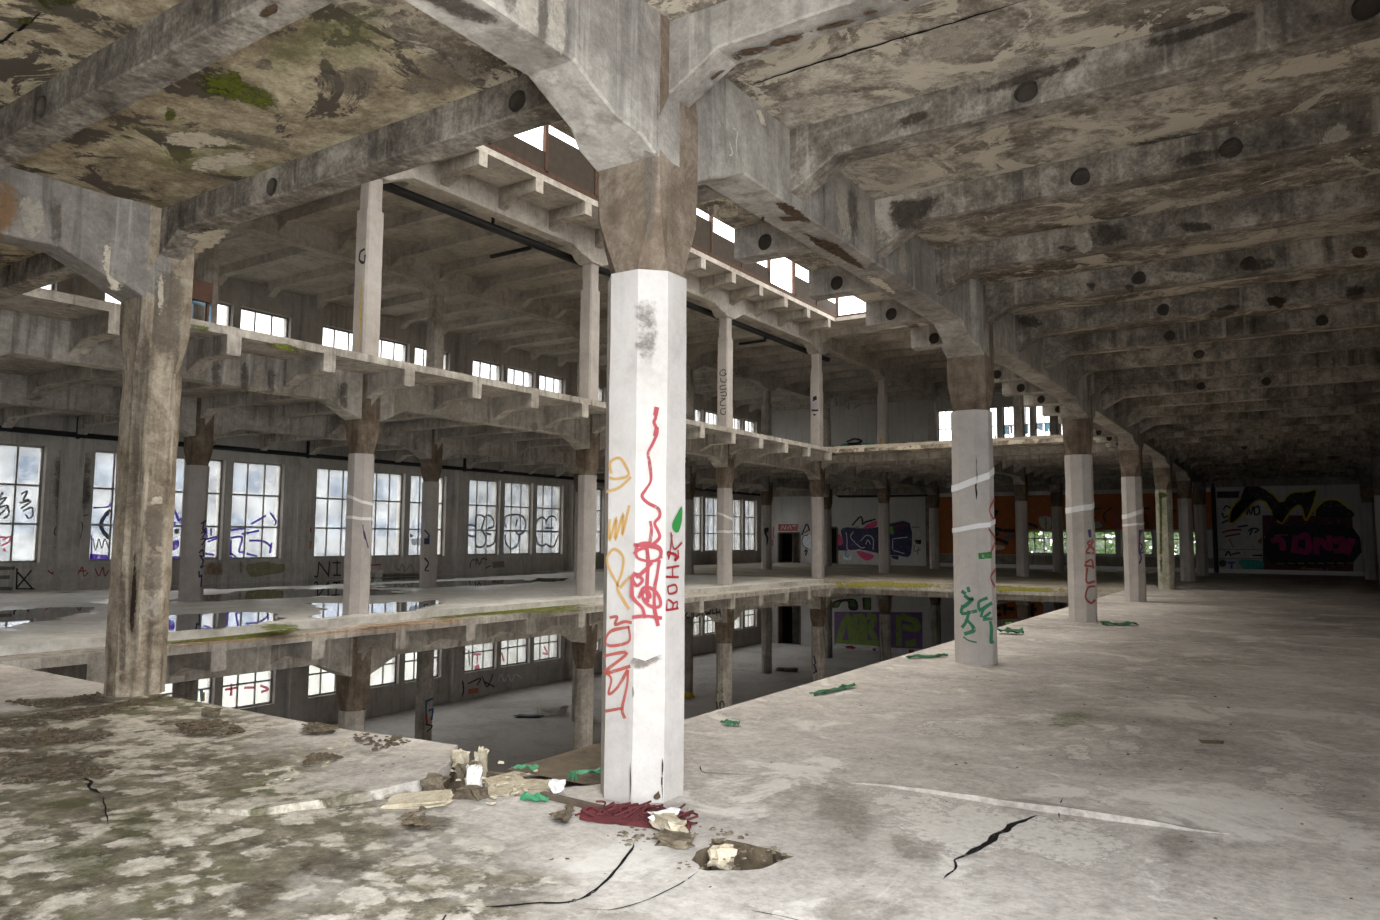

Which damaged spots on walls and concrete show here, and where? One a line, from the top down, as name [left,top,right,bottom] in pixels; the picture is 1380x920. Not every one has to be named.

crack [0,12,42,44]
crack [943,798,1063,879]